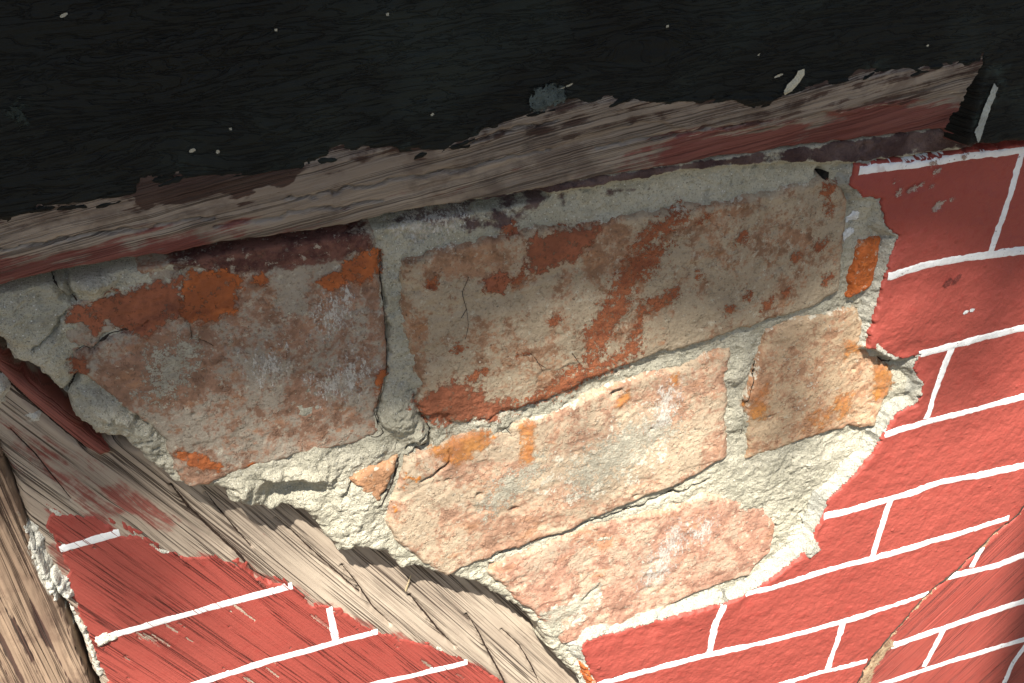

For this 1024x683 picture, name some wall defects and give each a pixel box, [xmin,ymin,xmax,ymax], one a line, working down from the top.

peeling [609,95,637,107]
peeling [27,201,121,213]
spalling [315,243,384,292]
spalling [481,220,603,296]
spalling [65,268,269,340]
spalling [66,355,90,375]
spalling [173,451,224,473]
spalling [409,367,517,465]
spalling [519,421,536,463]
flaking render [564,159,924,683]
peeling [102,518,190,568]
crack [857,506,1024,683]